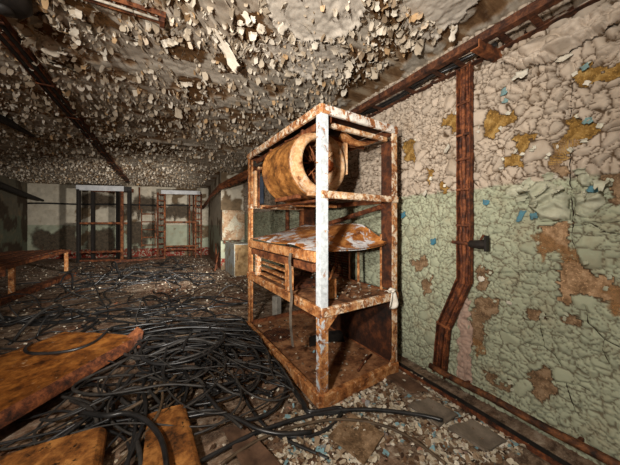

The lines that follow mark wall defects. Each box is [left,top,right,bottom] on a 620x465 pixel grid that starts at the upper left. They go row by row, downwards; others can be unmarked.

peeling [571,61,620,87]
peeling [0,0,480,189]
peeling [476,109,517,139]
peeling [498,133,538,169]
peeling [544,113,604,179]
damp [31,224,76,255]
damp [81,192,114,208]
damp [124,195,160,252]
damp [166,203,189,221]
crack [569,153,620,250]
flaking render [456,265,512,383]
peeling [524,363,557,403]